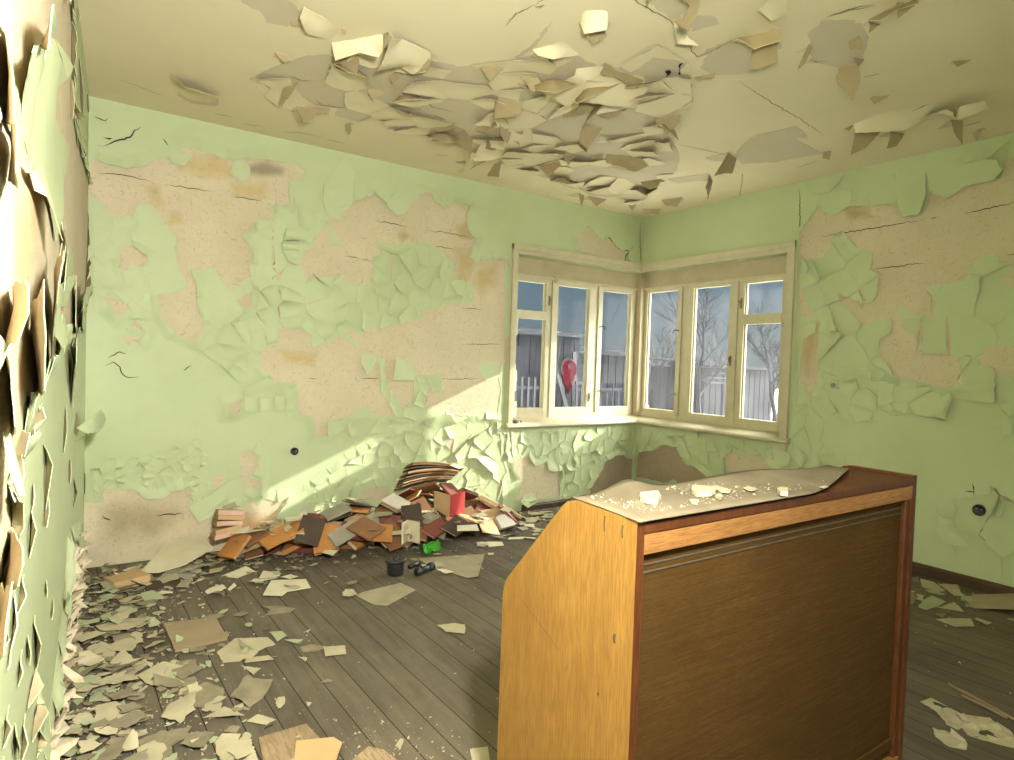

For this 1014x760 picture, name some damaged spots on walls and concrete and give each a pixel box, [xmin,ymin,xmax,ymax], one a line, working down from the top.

peeling [795,0,919,100]
peeling [240,0,832,214]
peeling [571,218,637,270]
peeling [790,95,1014,459]
peeling [0,0,518,760]
peeling [507,446,579,509]
peeling [839,454,883,469]